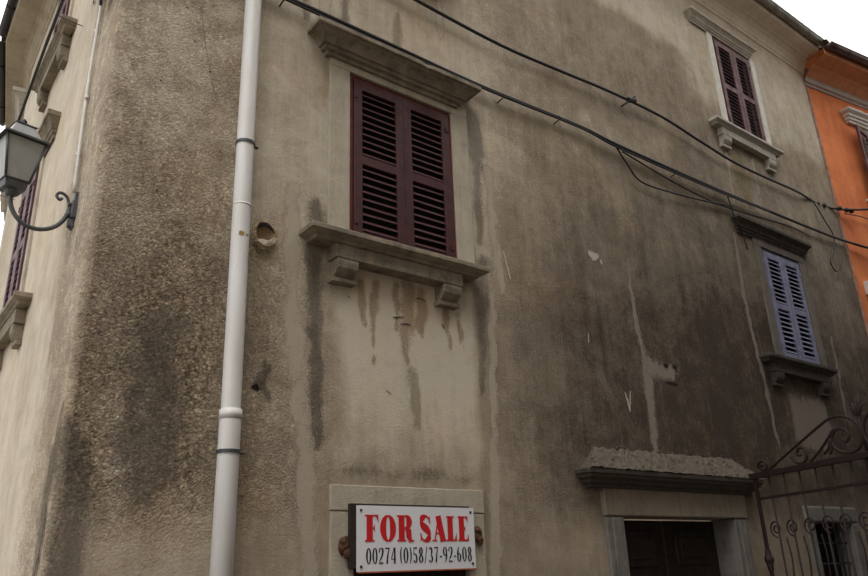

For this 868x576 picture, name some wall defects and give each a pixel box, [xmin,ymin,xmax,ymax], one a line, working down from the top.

water stain [281,181,321,576]